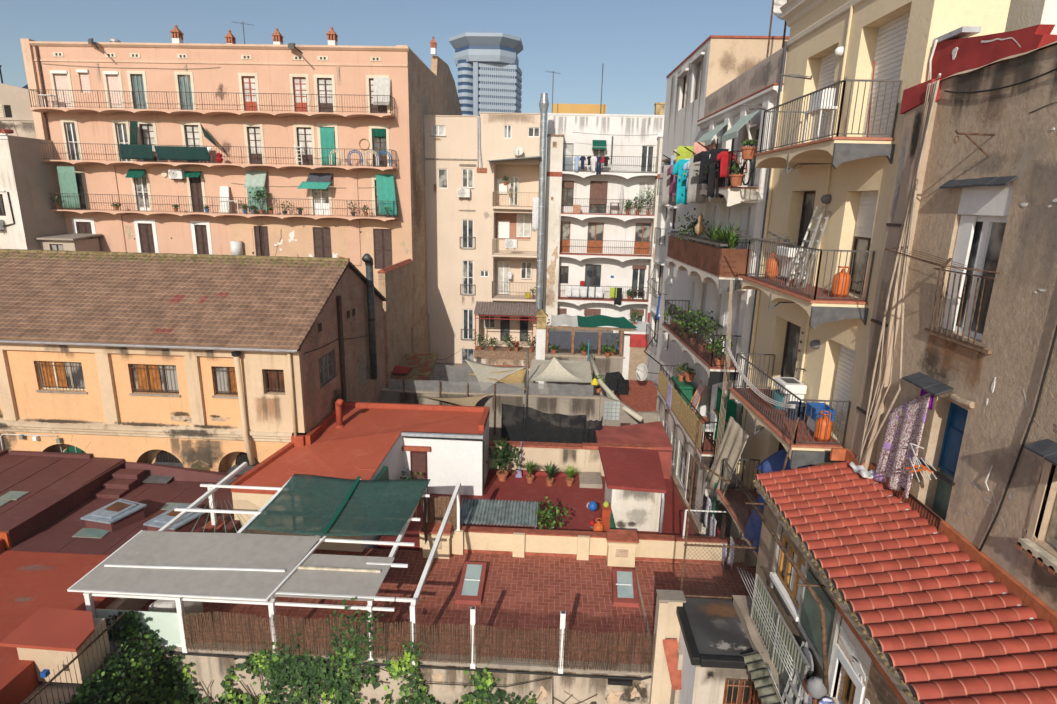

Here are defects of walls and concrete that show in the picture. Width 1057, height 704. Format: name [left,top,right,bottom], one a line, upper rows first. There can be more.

water stain [910,114,921,156]
spalling [546,245,558,290]
water stain [0,411,14,451]
water stain [118,422,231,471]